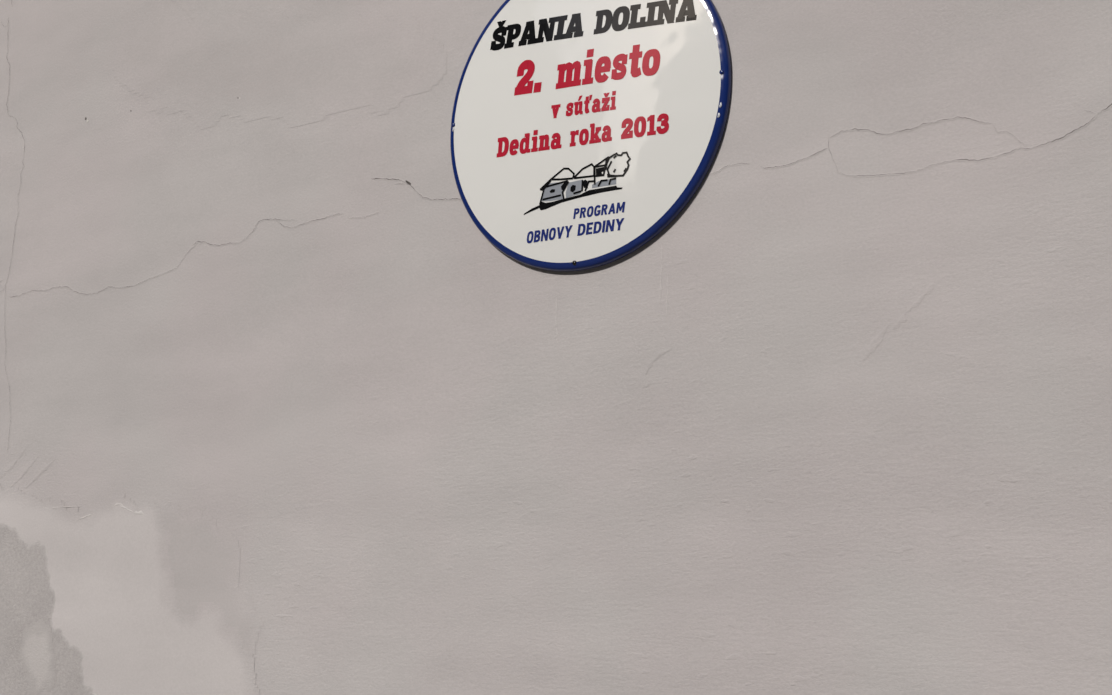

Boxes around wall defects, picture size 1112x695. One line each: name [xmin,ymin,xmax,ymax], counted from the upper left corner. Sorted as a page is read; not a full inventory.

crack [706,102,1112,178]
crack [371,177,461,201]